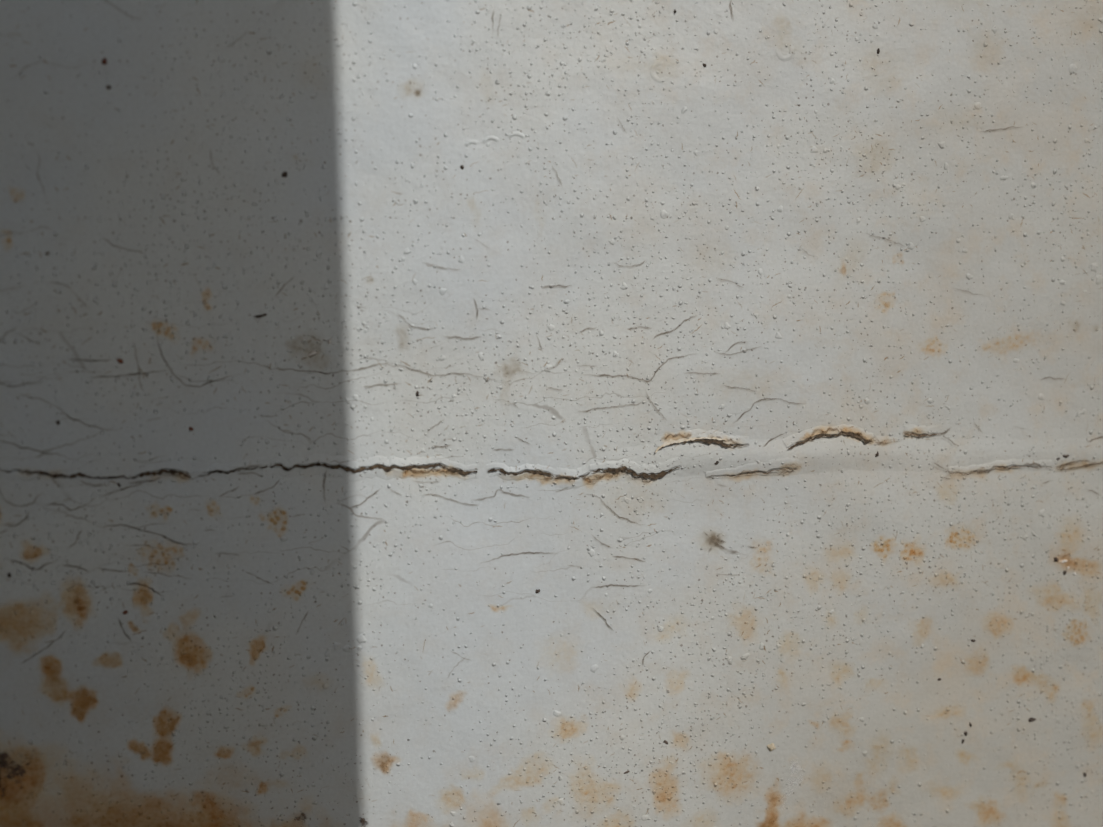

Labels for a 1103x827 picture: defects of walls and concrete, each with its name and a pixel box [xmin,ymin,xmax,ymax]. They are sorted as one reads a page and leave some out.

crack [904,424,946,437]
crack [0,413,874,510]
crack [948,459,1094,491]